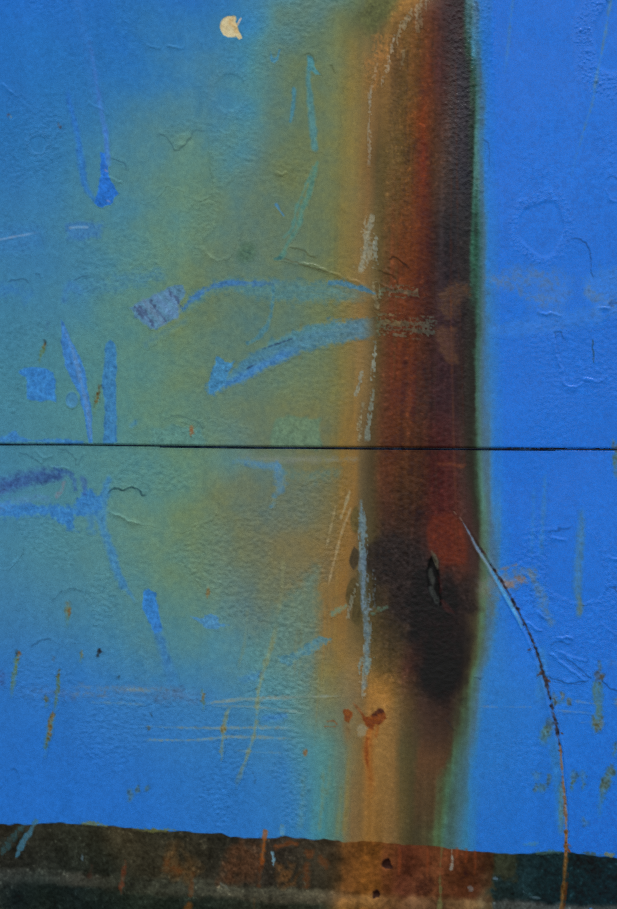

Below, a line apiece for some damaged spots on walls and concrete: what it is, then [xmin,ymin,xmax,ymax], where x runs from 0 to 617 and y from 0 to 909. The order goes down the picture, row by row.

rust [512,584,617,680]
rust [533,658,549,705]
rust [42,710,57,759]
rust [295,770,308,832]
rust [308,746,353,837]
rust [341,707,355,747]
rust [359,707,387,799]
rust [537,715,555,747]
rust [547,660,617,858]
rust [214,836,261,889]
rust [272,837,521,909]
rust [558,829,570,909]